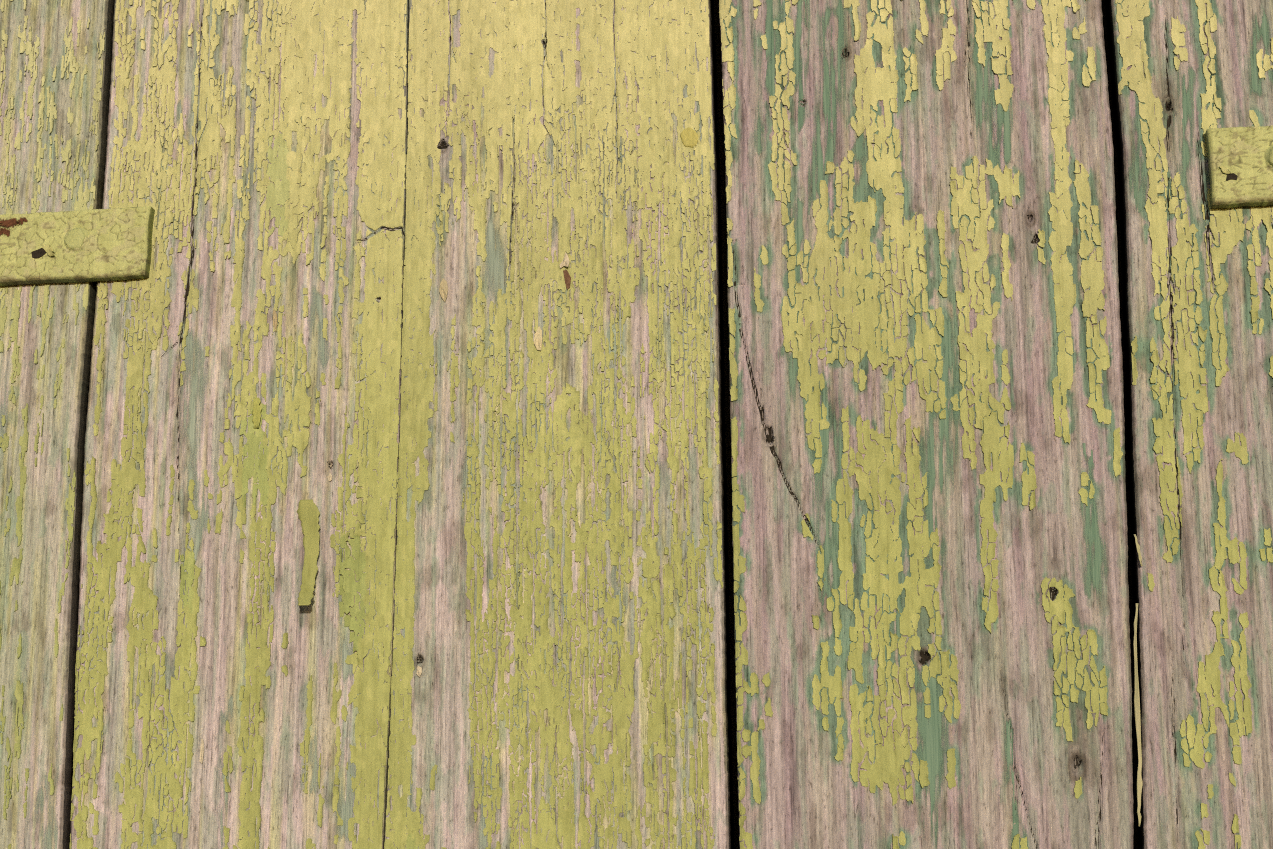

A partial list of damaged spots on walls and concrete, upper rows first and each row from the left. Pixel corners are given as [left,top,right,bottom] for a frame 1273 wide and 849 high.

corrosion [0,217,27,236]
peeling [0,0,231,386]
crack [359,226,405,242]
crack [732,245,820,548]
peeling [802,150,1020,805]
peeling [890,0,957,158]
peeling [972,0,1036,112]
peeling [1041,577,1108,742]
peeling [1052,160,1123,476]
peeling [1171,0,1222,157]
peeling [1131,119,1272,563]
peeling [1179,432,1273,787]